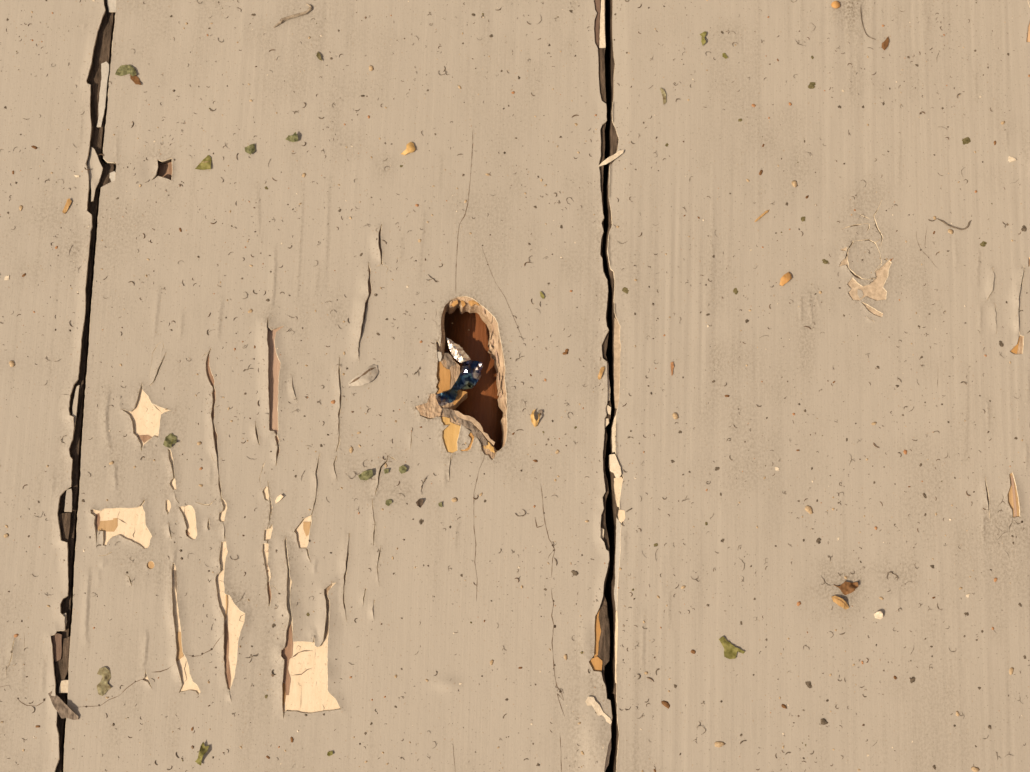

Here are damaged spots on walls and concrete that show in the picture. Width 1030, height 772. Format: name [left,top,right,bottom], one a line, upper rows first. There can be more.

peeling [123,387,168,450]
peeling [267,322,284,434]
spalling [416,297,507,460]
peeling [91,500,152,549]
peeling [166,449,227,539]
peeling [263,487,283,582]
peeling [172,563,200,694]
peeling [216,542,245,690]
peeling [281,512,341,716]